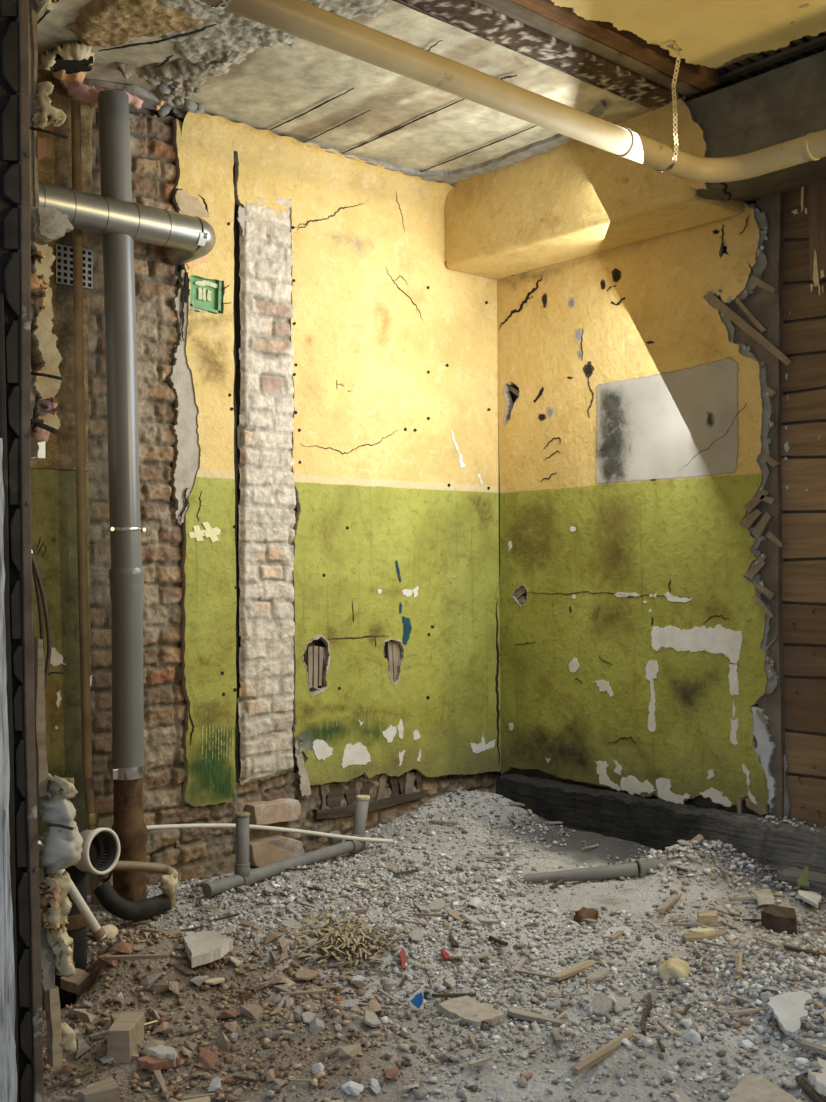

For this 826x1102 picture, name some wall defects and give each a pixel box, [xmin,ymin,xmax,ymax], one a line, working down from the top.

spalling [65,0,304,218]
flaking render [294,134,572,182]
crack [499,270,543,329]
flaking render [600,268,625,305]
crack [300,430,398,454]
leakage [598,392,630,480]
flaking render [703,203,793,694]
flaking render [87,231,114,829]
spalling [134,198,498,885]
peeling [645,624,742,746]
leakage [191,707,233,797]
peeling [596,706,777,815]